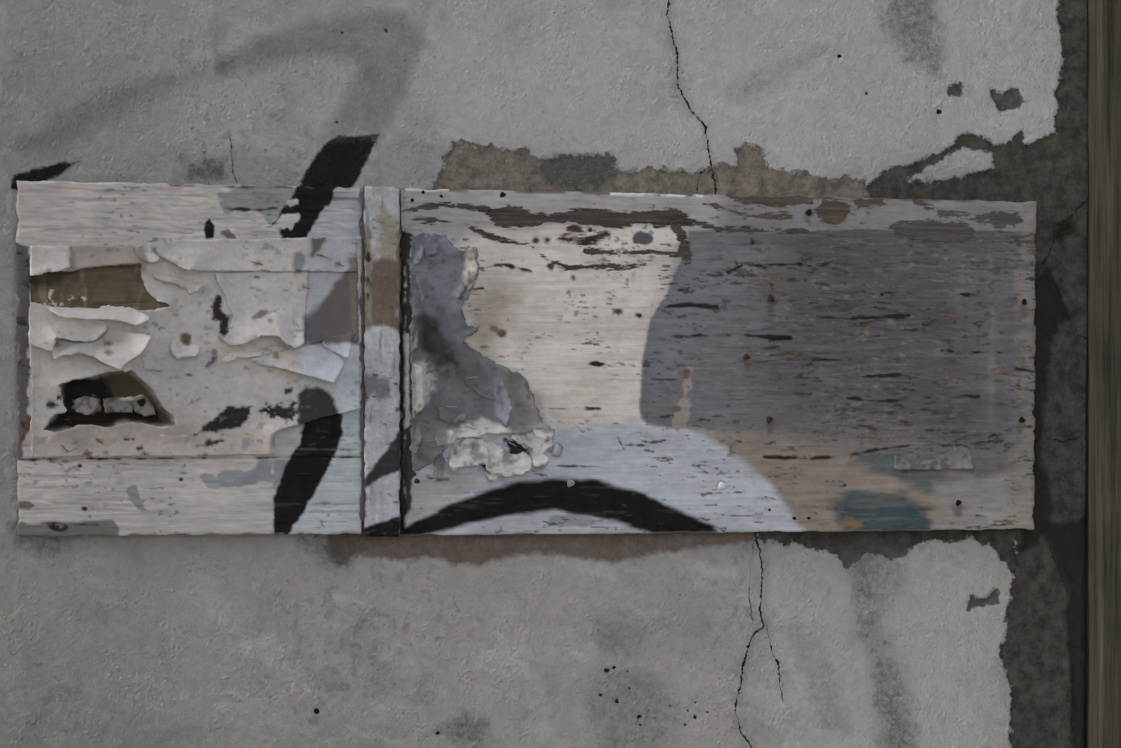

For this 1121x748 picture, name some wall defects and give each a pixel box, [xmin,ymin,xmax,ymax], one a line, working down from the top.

crack [666,0,717,195]
peeling [403,0,1088,748]
crack [734,532,783,748]